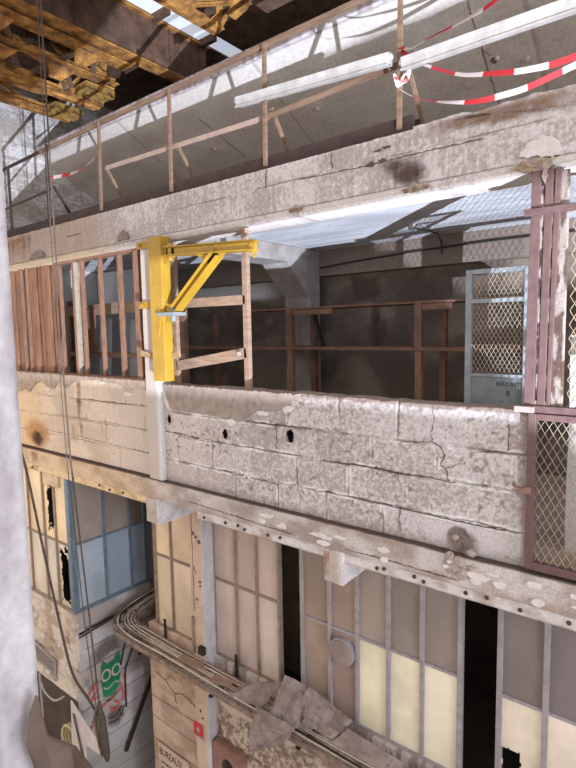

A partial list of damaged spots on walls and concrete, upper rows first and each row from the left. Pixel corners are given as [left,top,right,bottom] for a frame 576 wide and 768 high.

crack [300,138,484,180]
water stain [386,159,423,182]
peeling [505,135,571,407]
rust [28,422,46,459]
crack [321,406,510,483]
peeling [259,513,287,529]
peeling [309,532,347,547]
peeling [377,546,390,563]
spalling [442,530,506,589]
peeling [527,581,545,608]
crack [155,671,195,706]